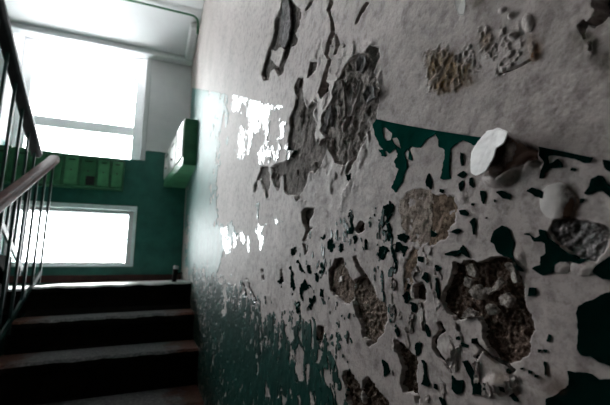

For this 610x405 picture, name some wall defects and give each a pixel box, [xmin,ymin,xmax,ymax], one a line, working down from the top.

flaking render [265,0,301,80]
peeling [538,147,593,179]
peeling [579,160,610,203]
peeling [185,46,552,405]
flaking render [524,218,610,280]
peeling [576,292,610,366]
peeling [545,371,610,405]